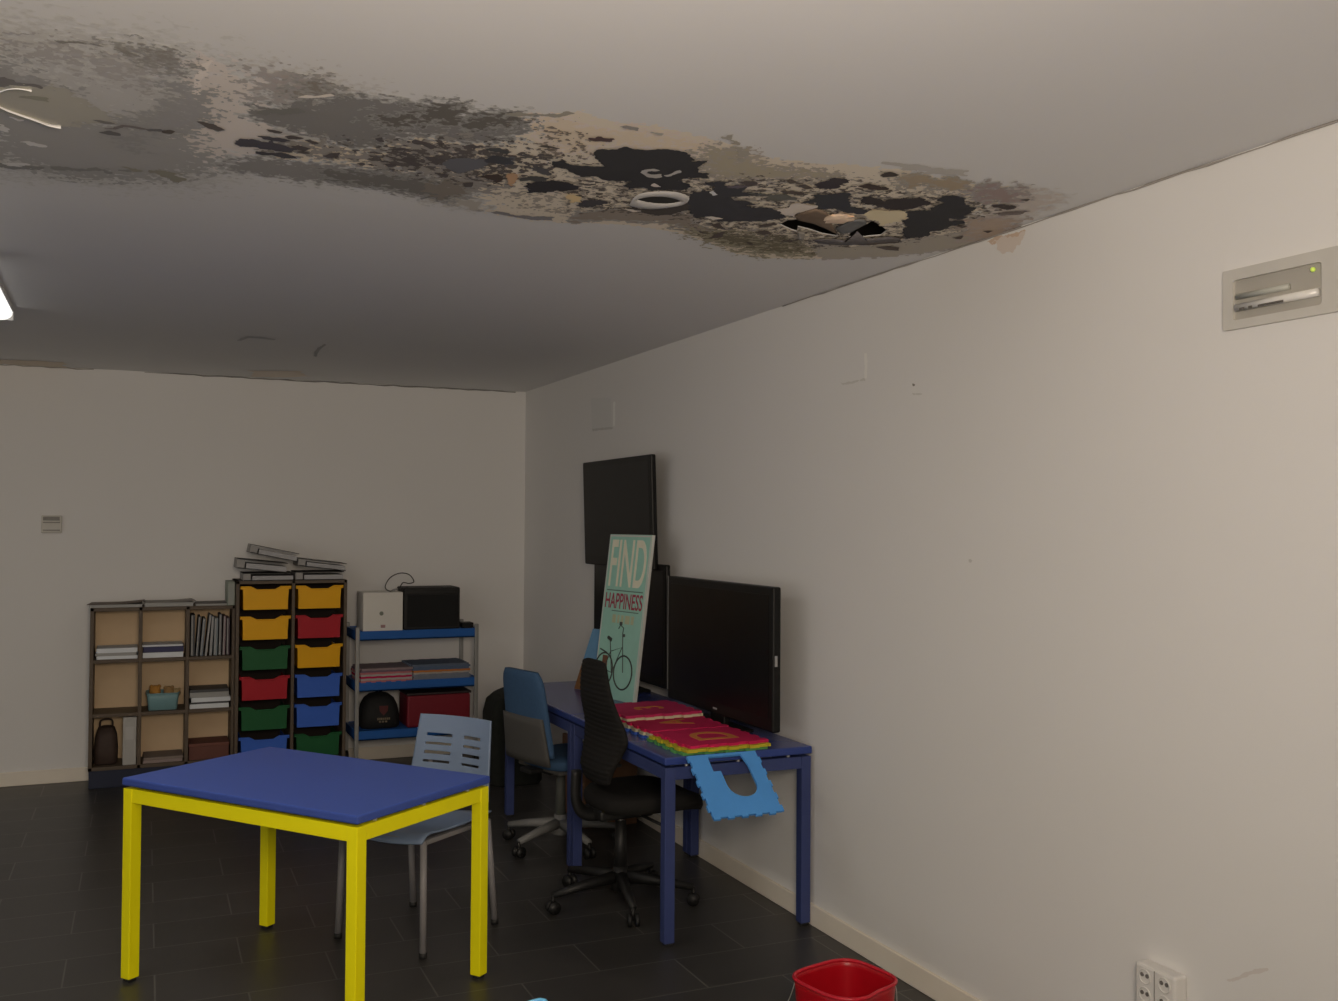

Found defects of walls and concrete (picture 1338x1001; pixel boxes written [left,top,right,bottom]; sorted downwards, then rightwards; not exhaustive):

peeling [0,84,120,132]
damp [0,0,1078,261]
peeling [275,109,1009,259]